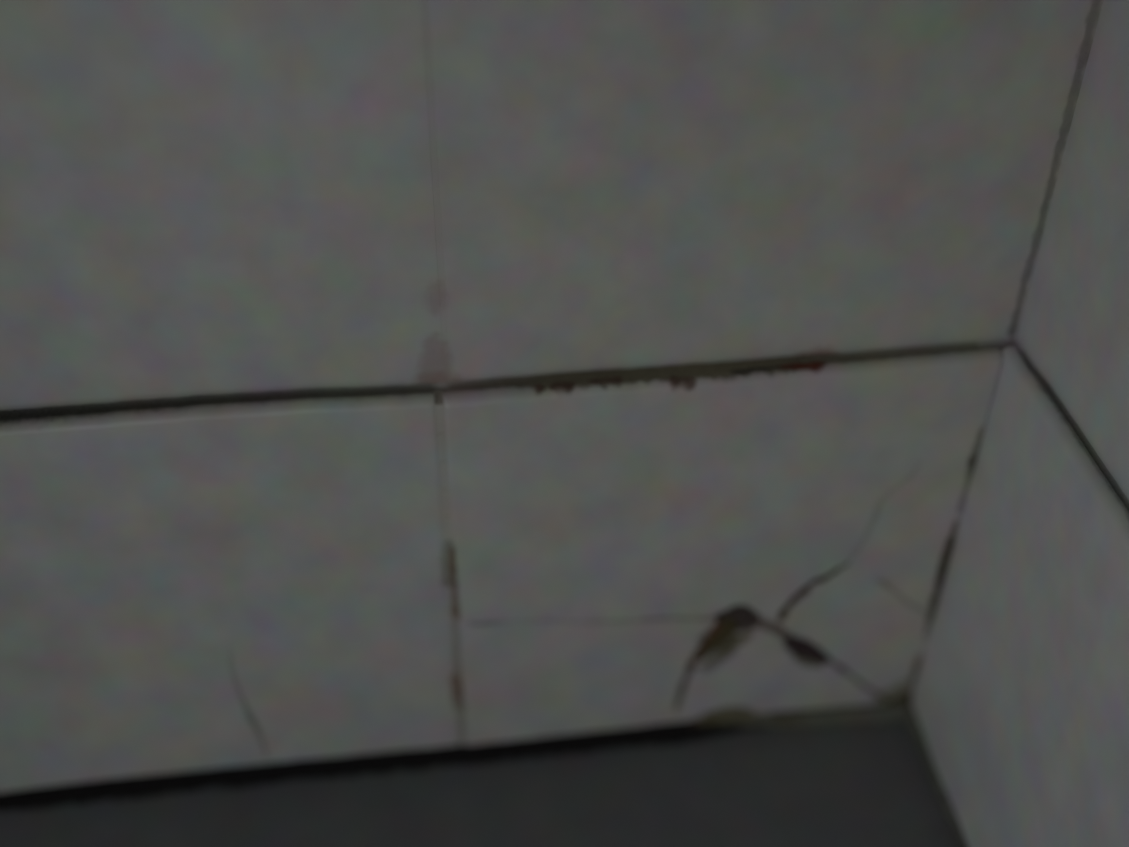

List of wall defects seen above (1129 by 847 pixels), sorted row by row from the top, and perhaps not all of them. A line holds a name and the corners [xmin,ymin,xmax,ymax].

rust [781,362,824,371]
crack [760,563,848,639]